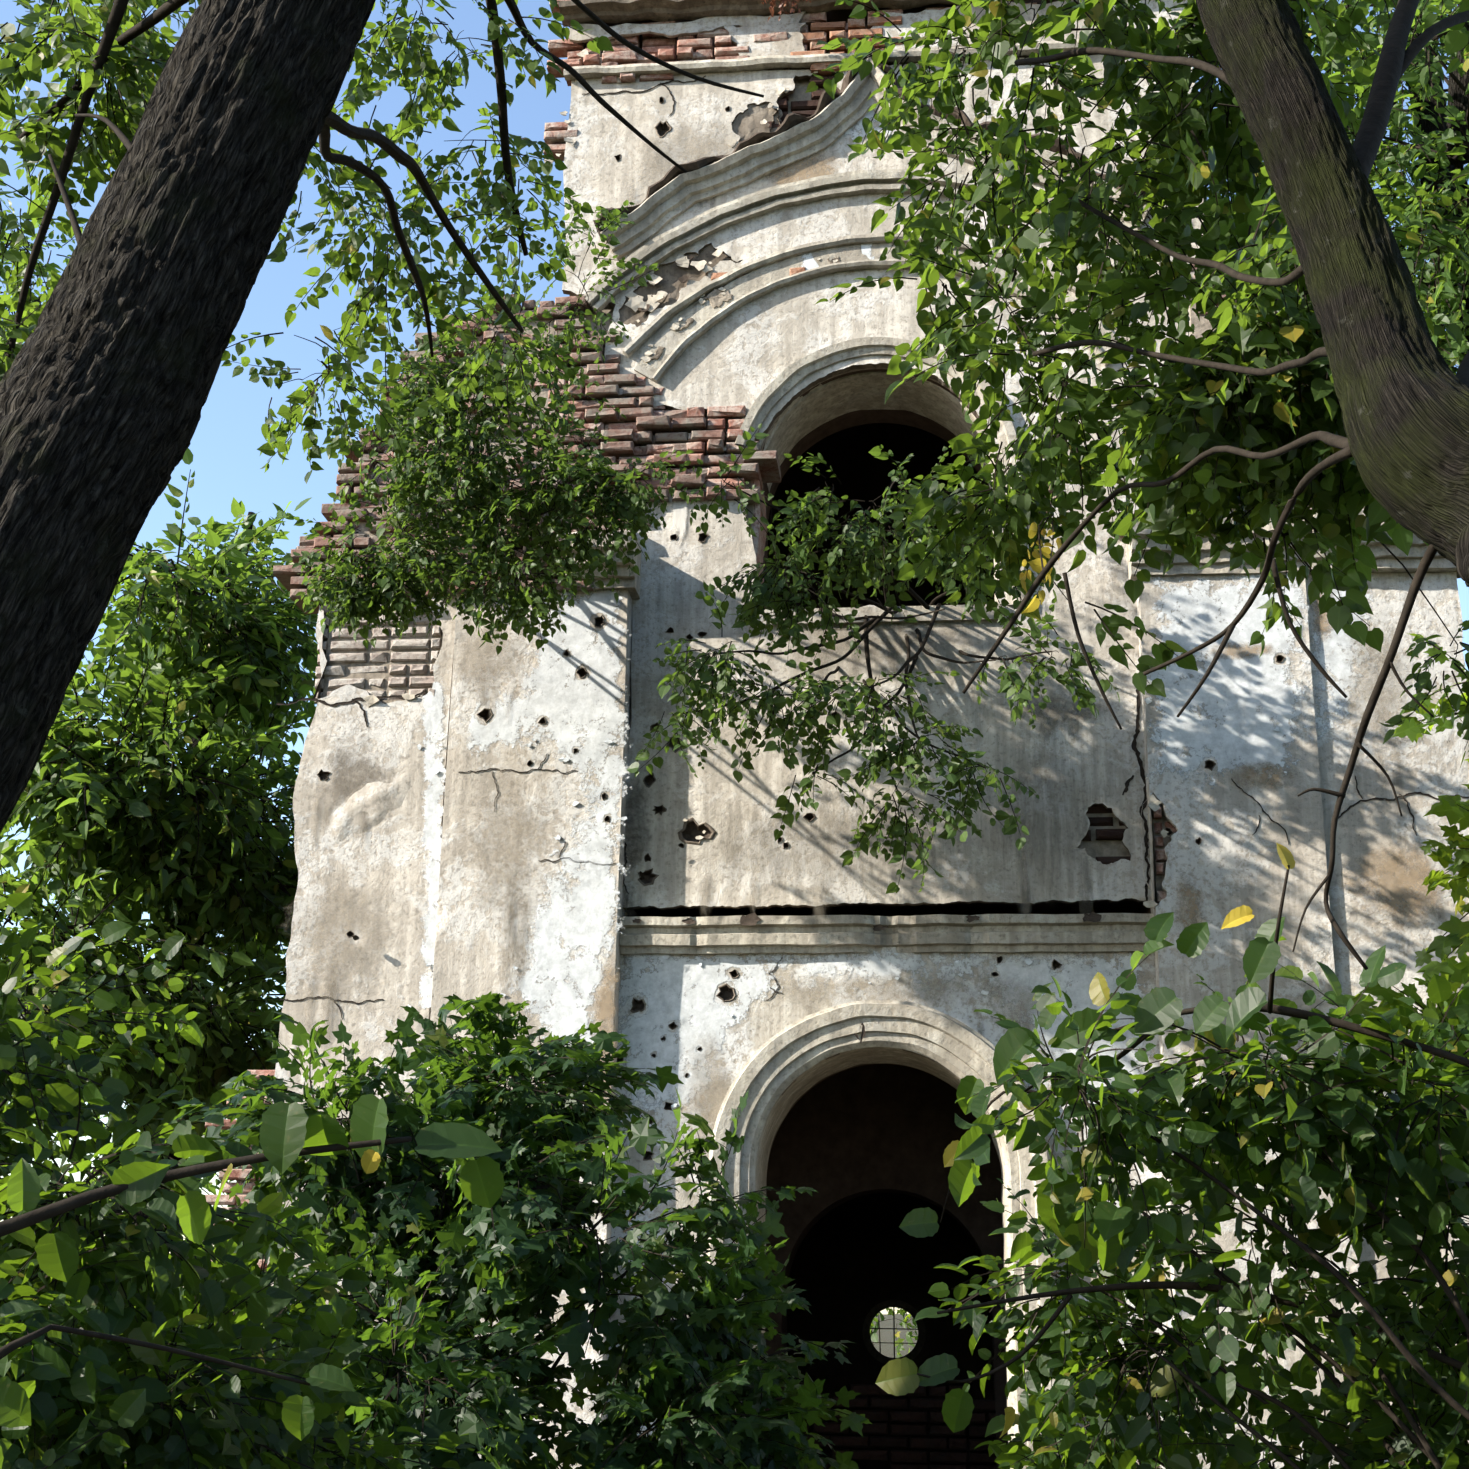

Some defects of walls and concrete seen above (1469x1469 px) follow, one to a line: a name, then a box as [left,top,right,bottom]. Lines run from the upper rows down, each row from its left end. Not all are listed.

flaking render [563,16,903,148]
flaking render [611,244,755,331]
flaking render [530,344,746,501]
crack [459,754,578,812]
peeling [315,589,1154,1116]
crack [1122,689,1150,901]
peeling [1143,573,1377,908]